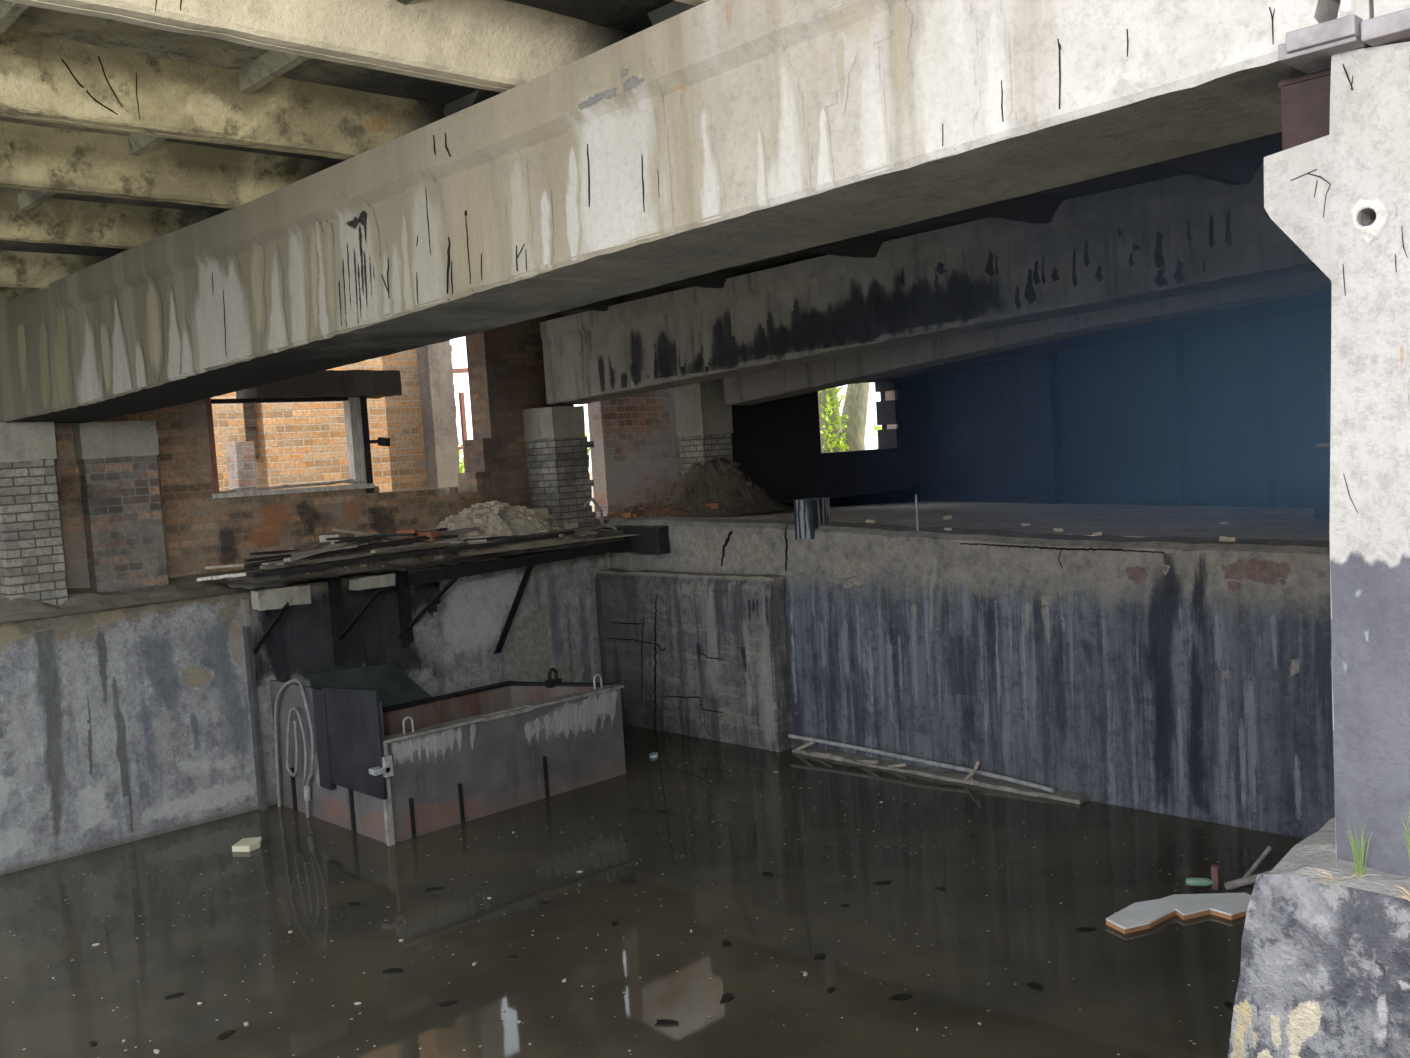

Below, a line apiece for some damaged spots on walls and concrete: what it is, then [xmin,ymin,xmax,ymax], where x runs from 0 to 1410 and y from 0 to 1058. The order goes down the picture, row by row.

crack [61,56,140,119]
crack [1055,39,1063,109]
damp [73,54,675,404]
crack [1290,169,1331,217]
spalling [1349,195,1396,245]
damp [598,272,969,392]
crack [721,528,733,567]
damp [1136,545,1223,821]
damp [0,604,286,875]
damp [1239,683,1258,810]
peeling [1228,993,1328,1058]
spalling [1368,957,1410,1049]